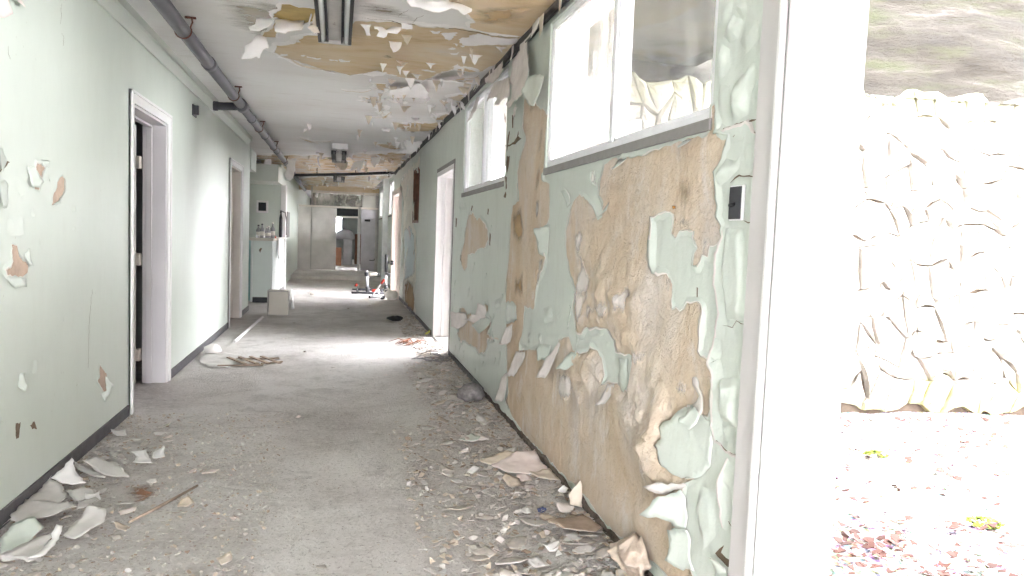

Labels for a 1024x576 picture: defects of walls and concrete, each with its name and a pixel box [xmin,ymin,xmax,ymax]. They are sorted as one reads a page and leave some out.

peeling [241,0,555,317]
peeling [28,159,66,207]
peeling [1,242,34,288]
peeling [450,98,735,576]
peeling [96,363,114,402]